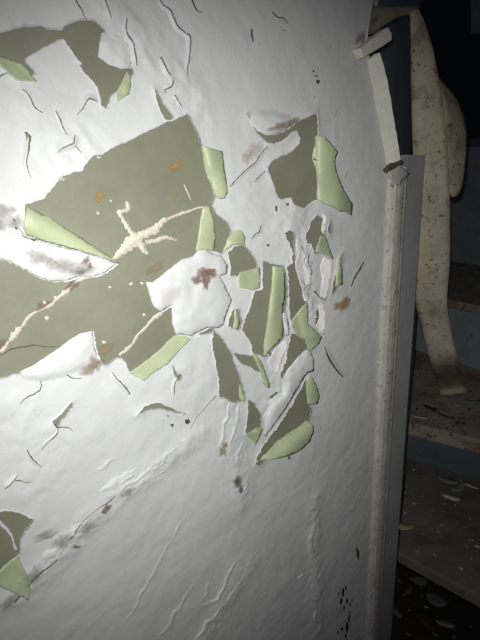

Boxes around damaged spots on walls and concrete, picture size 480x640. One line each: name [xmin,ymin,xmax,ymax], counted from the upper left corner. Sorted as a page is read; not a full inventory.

peeling [0,21,132,108]
crack [156,0,192,107]
peeling [0,96,353,463]
corrosion [192,269,216,288]
crack [324,346,345,377]
peeling [0,511,33,600]